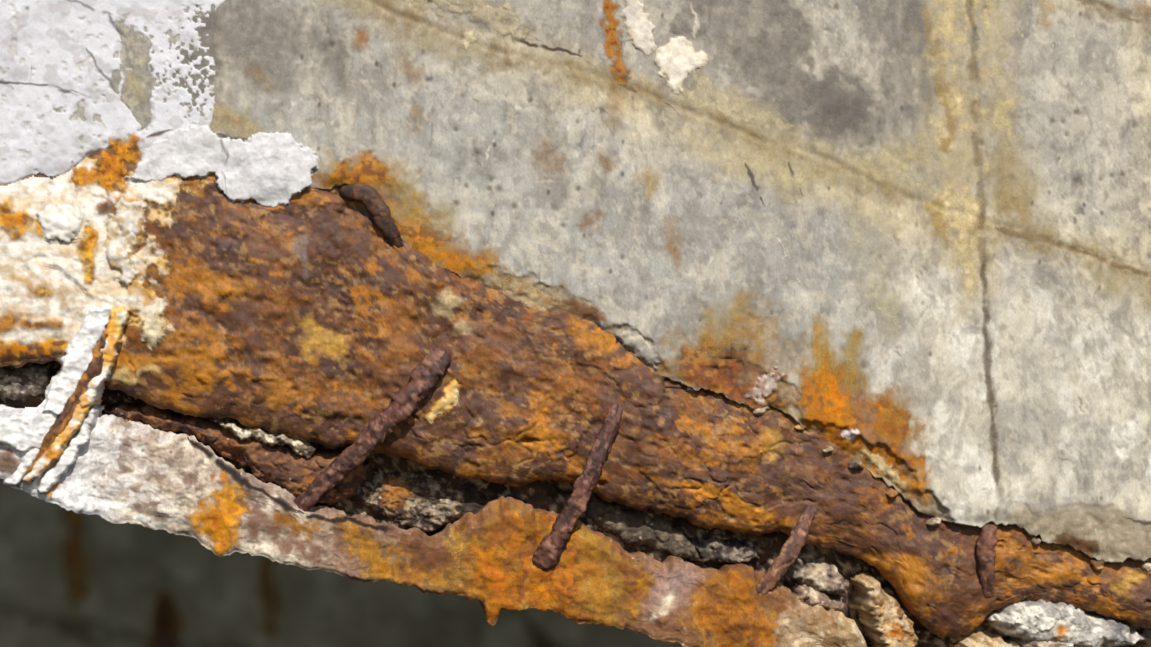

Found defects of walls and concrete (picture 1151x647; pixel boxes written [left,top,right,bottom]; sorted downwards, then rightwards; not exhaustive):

crack [520,39,583,56]
rust [601,0,628,89]
rust [0,174,53,239]
peeling [0,12,318,409]
crack [147,129,173,137]
crack [216,133,248,192]
crack [745,163,764,204]
rust [0,312,68,368]
rust [69,134,1151,647]
spalling [99,375,351,497]
spalling [314,453,574,536]
spalling [779,544,1151,647]